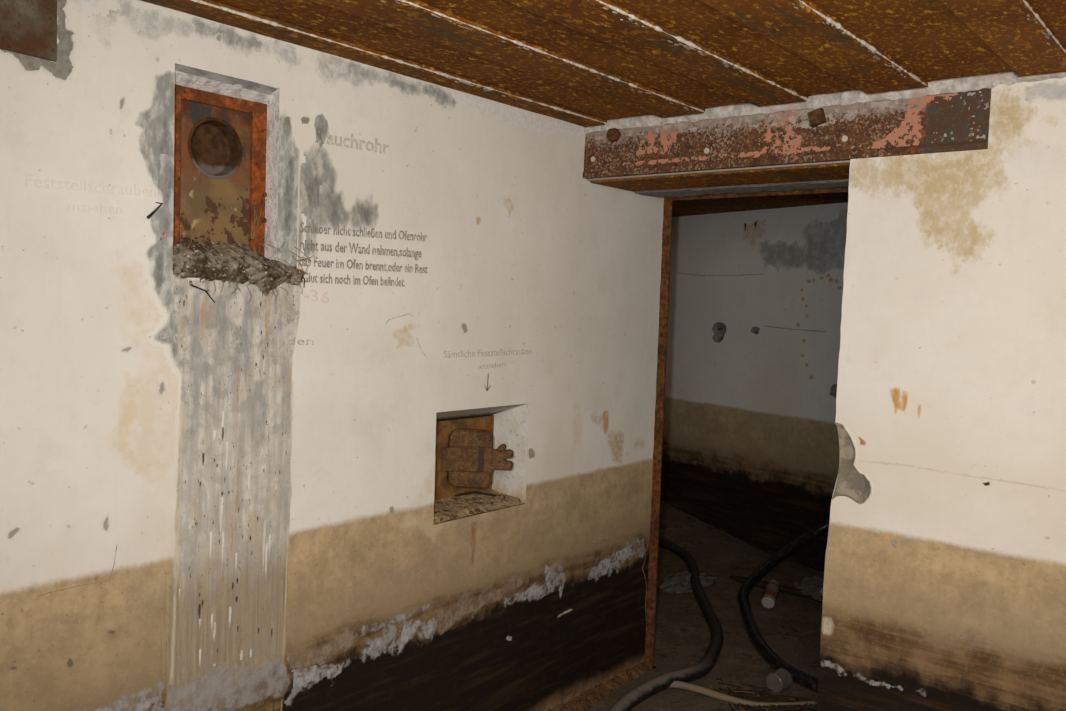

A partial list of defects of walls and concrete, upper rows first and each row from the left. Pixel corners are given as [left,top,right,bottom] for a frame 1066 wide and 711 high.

water stain [792,0,927,86]
water stain [1022,0,1066,60]
water stain [710,77,1066,285]
water stain [0,65,653,711]
rust [886,385,924,421]
spalling [832,423,874,504]
water stain [660,391,1066,711]